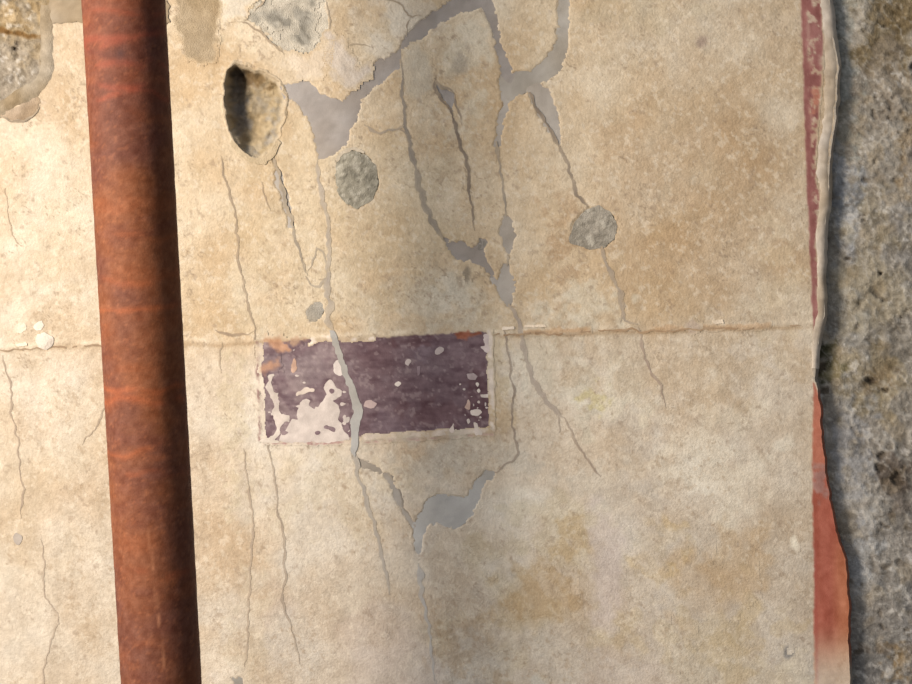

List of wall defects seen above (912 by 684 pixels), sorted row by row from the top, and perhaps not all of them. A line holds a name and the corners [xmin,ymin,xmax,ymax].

crack [240,1,284,54]
crack [215,157,256,372]
peeling [260,349,350,443]
peeling [459,373,488,435]
crack [261,0,800,595]
crack [232,449,254,684]
crack [267,445,300,665]